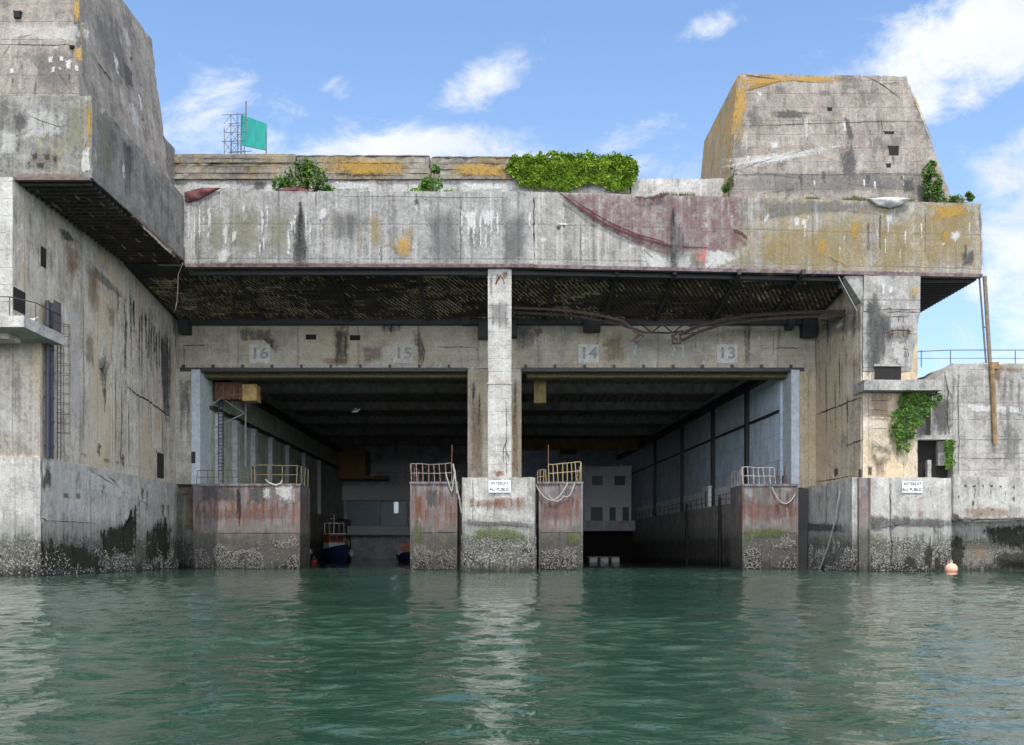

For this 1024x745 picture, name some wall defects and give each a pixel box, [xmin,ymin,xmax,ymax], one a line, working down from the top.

water stain [287,202,330,267]
crack [115,367,171,459]
water stain [71,464,158,552]
corrosion [415,489,452,523]